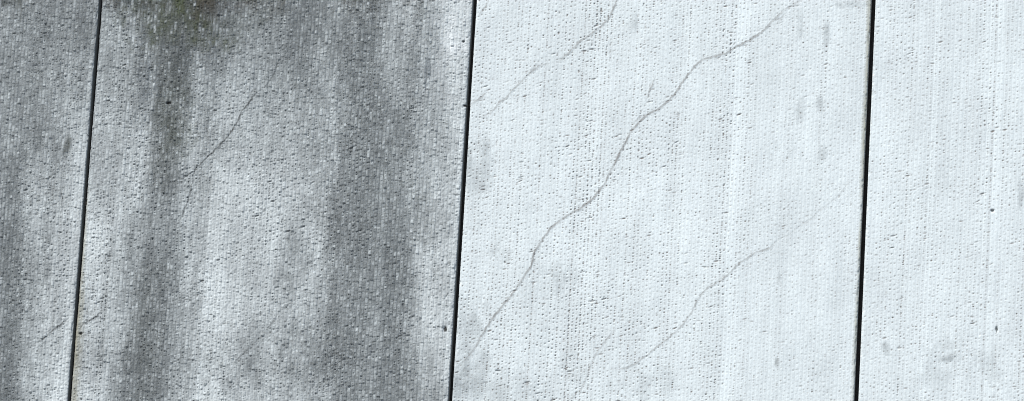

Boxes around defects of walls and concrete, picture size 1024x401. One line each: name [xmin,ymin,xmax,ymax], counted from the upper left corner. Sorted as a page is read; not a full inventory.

damp [151,0,232,97]
efflorescence [429,0,469,89]
damp [0,1,39,401]
damp [117,171,180,401]
damp [334,136,404,401]